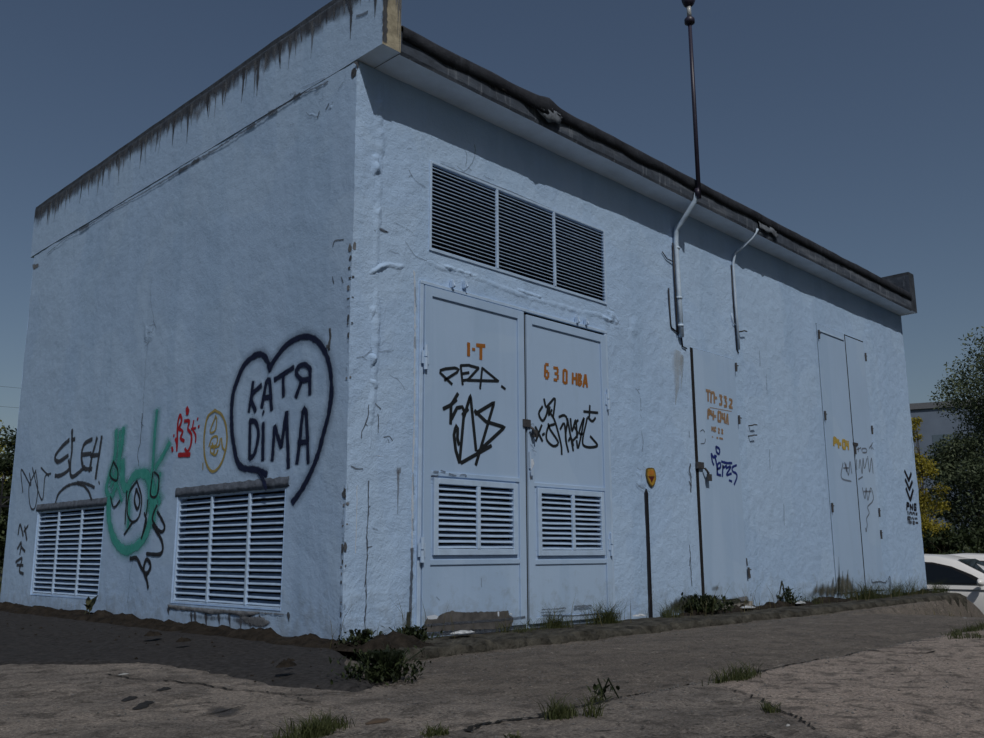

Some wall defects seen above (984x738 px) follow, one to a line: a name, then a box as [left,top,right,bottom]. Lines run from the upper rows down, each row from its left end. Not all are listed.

water stain [374,0,402,43]
water stain [34,0,361,223]
crack [361,403,393,441]
peeling [424,605,620,636]